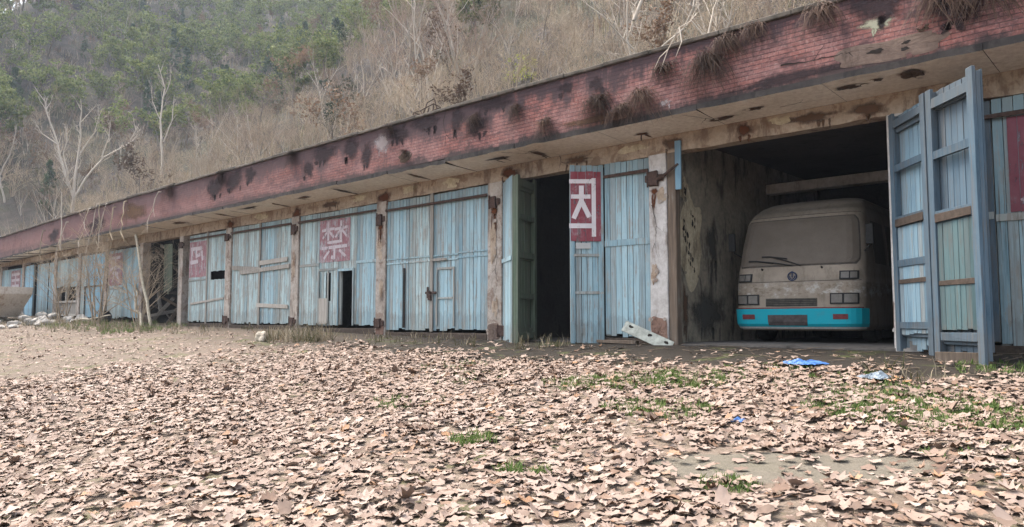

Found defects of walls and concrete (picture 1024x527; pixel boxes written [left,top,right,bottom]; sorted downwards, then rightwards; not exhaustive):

spalling [834,22,953,79]
damp [452,96,511,140]
damp [303,116,438,181]
damp [207,168,256,200]